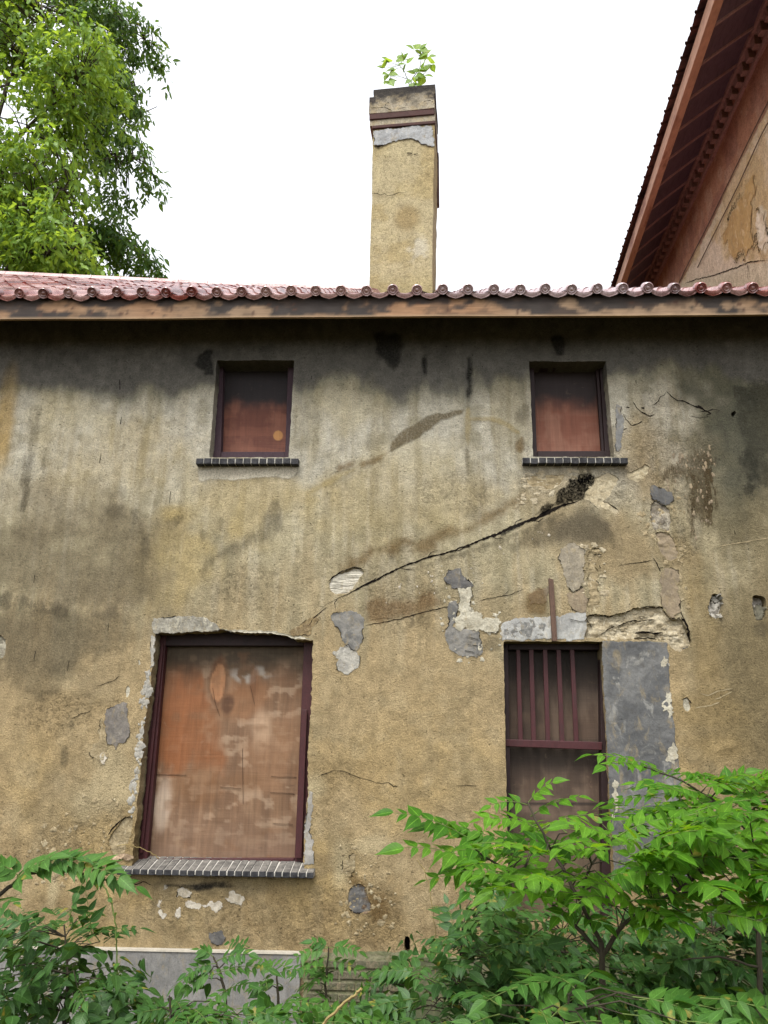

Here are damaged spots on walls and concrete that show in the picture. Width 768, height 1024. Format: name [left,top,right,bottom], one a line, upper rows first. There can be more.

flaking render [723,175,768,263]
damp [391,410,462,450]
crack [615,391,720,451]
efflorescence [198,466,298,481]
spalling [328,567,364,594]
crack [309,500,579,670]
spalling [578,444,715,667]
spalling [228,616,319,639]
peeling [662,692,692,718]
flaking render [26,660,153,861]
peeling [665,742,678,773]
flaking render [335,843,397,936]